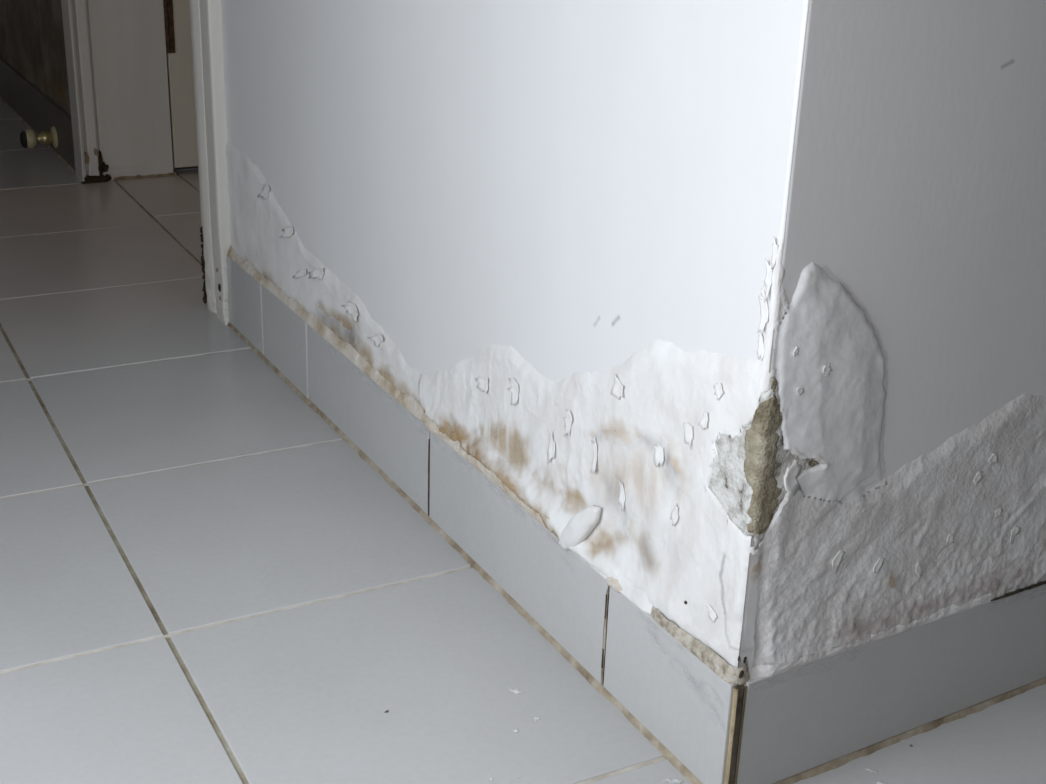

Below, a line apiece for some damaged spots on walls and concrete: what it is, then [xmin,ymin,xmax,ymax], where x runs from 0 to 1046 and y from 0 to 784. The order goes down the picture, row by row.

damp [495,431,524,462]
flaking render [225,0,1046,685]